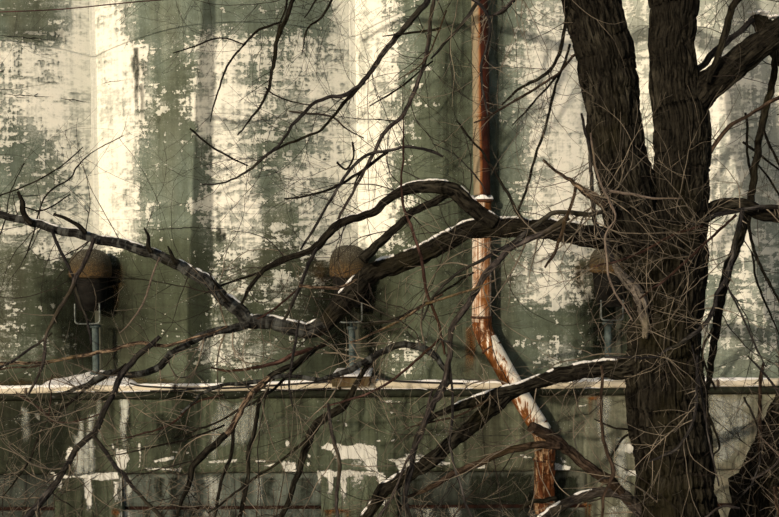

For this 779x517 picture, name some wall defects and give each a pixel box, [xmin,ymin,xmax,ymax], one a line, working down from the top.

peeling [0,0,440,319]
peeling [497,0,604,226]
peeling [622,0,655,168]
peeling [694,0,749,71]
peeling [709,58,779,205]
peeling [0,286,49,357]
peeling [189,329,277,382]
peeling [388,334,434,378]
peeling [508,239,595,368]
peeling [701,213,779,370]
spalling [52,443,189,511]
spalling [317,440,386,503]